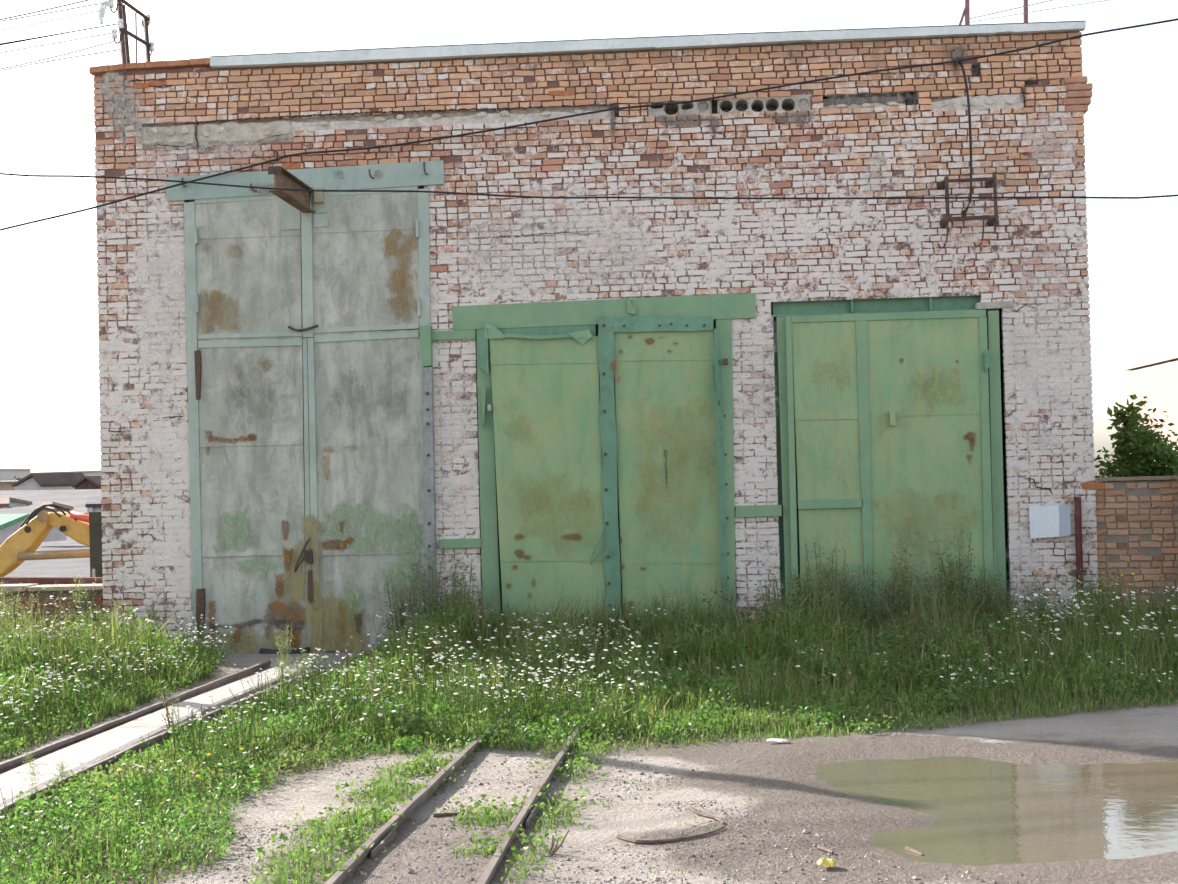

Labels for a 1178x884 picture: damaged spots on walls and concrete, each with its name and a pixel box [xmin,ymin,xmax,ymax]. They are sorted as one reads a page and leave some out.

spalling [133,81,167,89]
spalling [141,90,619,148]
rust [206,431,256,452]
rust [322,522,354,550]
rust [208,520,305,648]